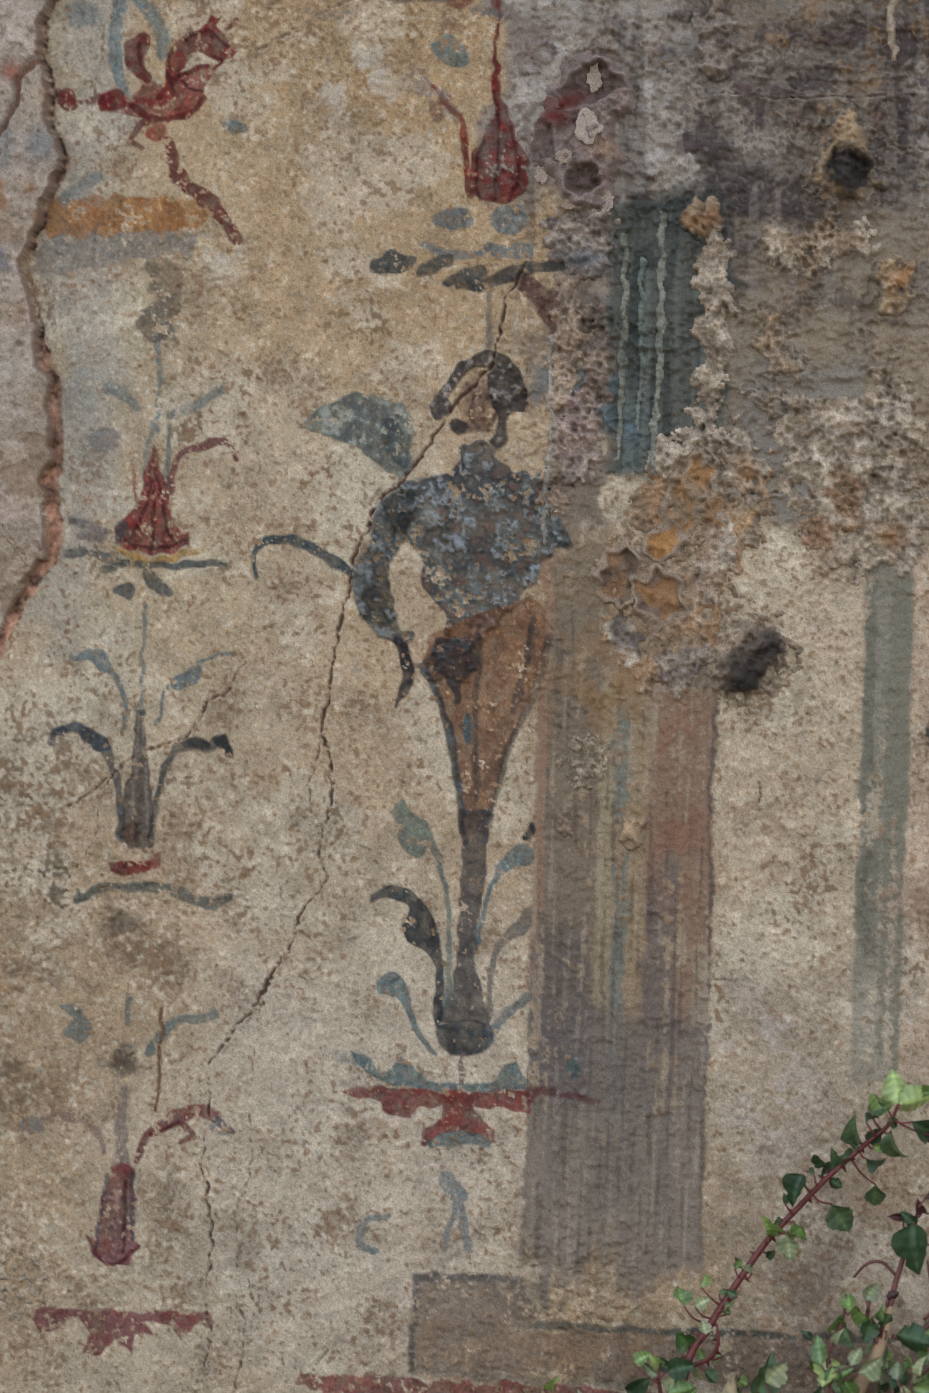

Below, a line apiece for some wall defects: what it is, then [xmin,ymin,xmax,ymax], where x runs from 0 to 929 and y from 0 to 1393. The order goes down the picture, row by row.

flaking render [525,50,638,212]
crack [0,0,123,659]
flaking render [590,447,719,635]
crack [56,658,252,871]
crack [195,246,533,1393]